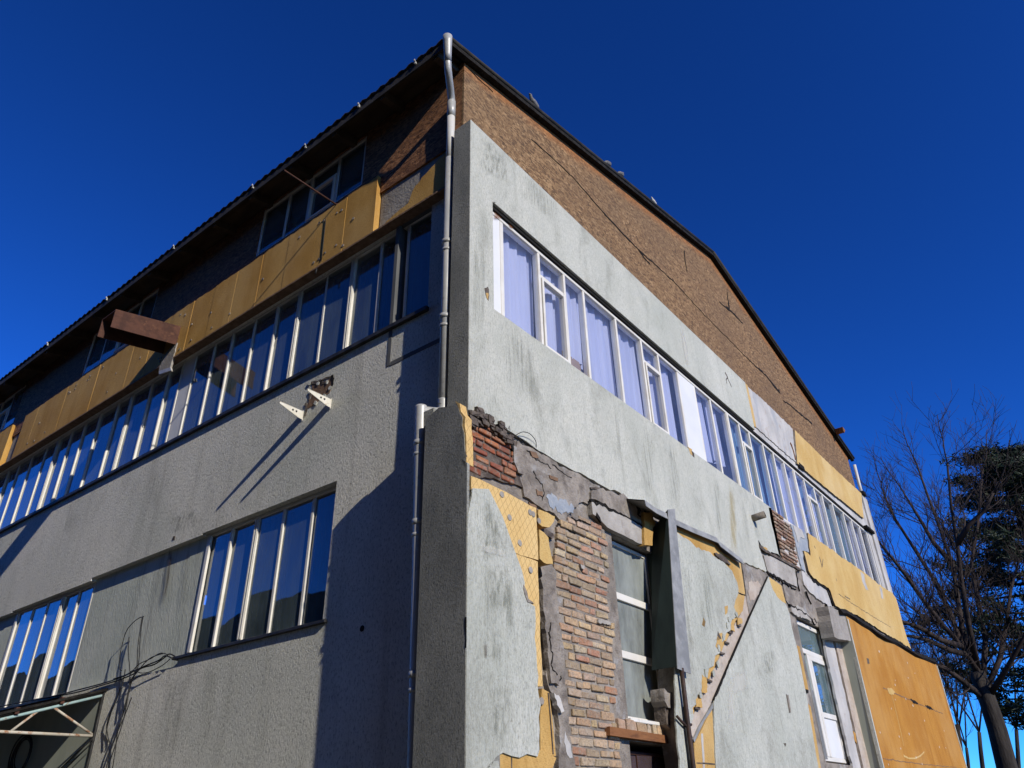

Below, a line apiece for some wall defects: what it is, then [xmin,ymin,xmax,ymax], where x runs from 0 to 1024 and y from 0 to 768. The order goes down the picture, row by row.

crack [531,139,812,424]
flaking render [468,406,664,768]
spalling [694,510,833,710]
spalling [822,639,861,768]